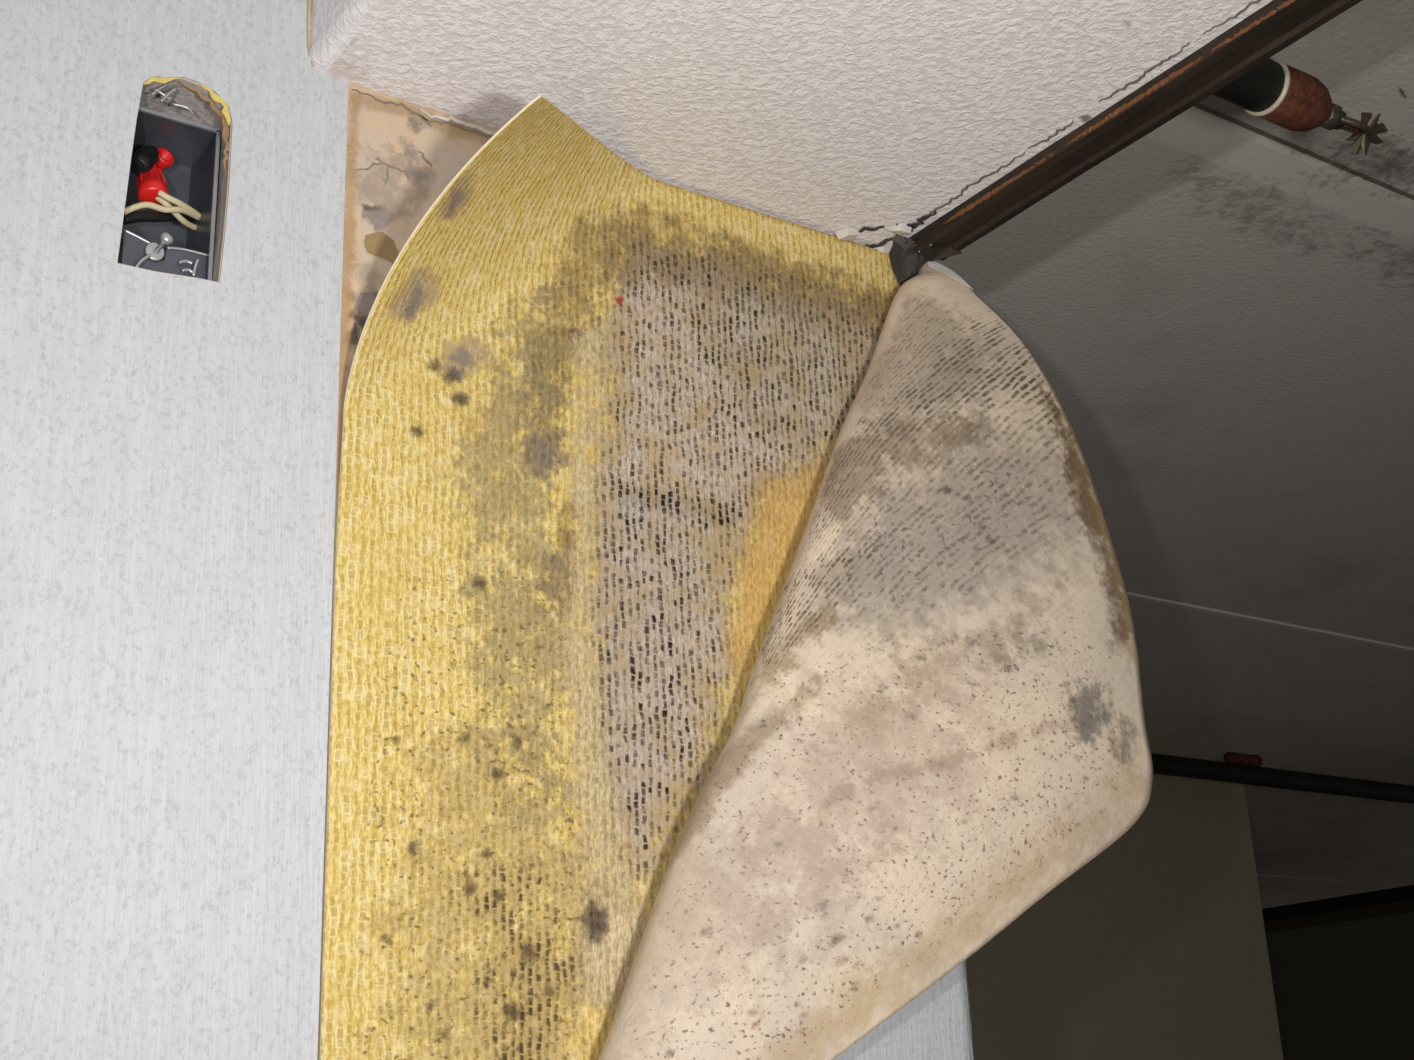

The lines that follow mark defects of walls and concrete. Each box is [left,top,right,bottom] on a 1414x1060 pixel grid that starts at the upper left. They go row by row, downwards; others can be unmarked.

spalling [363,205,399,264]
spalling [835,210,937,285]
leakage [348,293,378,343]
leakage [365,234,1134,1060]